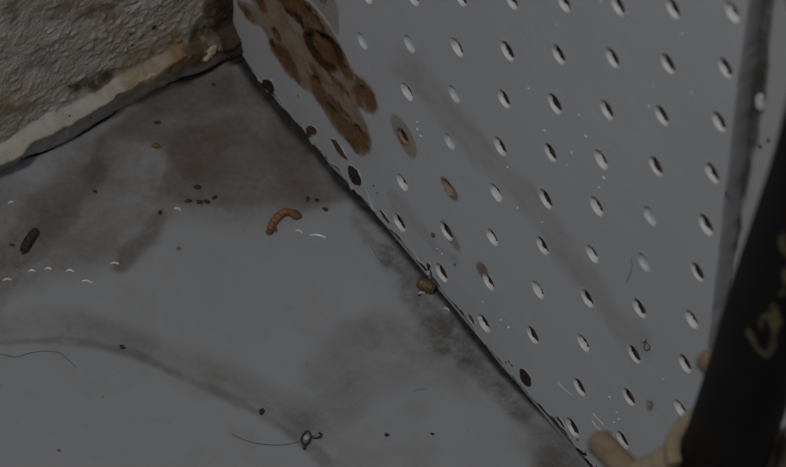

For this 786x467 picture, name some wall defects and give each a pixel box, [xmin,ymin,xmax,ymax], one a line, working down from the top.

water stain [72,72,112,91]
rust [239,0,376,155]